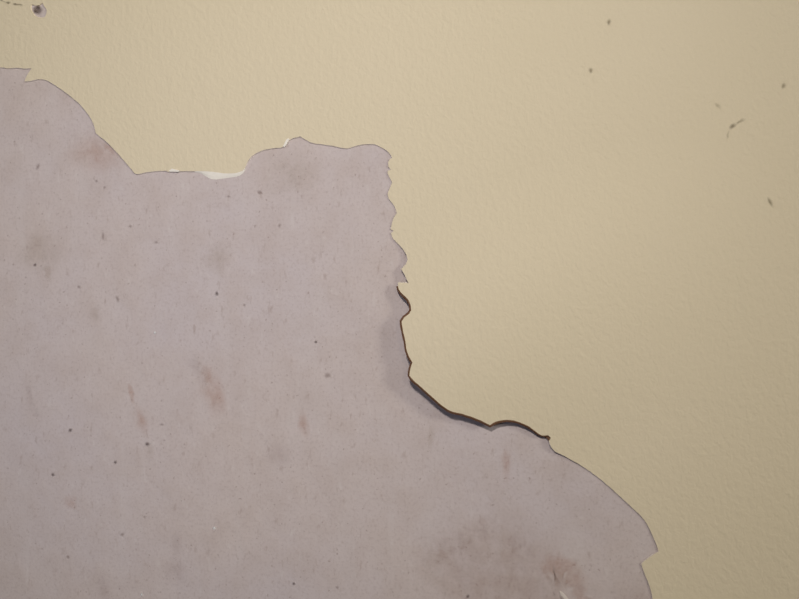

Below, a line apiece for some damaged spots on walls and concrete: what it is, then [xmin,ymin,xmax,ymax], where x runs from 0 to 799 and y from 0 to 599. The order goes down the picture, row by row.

peeling [29,2,48,19]
peeling [0,67,659,599]
peeling [391,130,780,475]